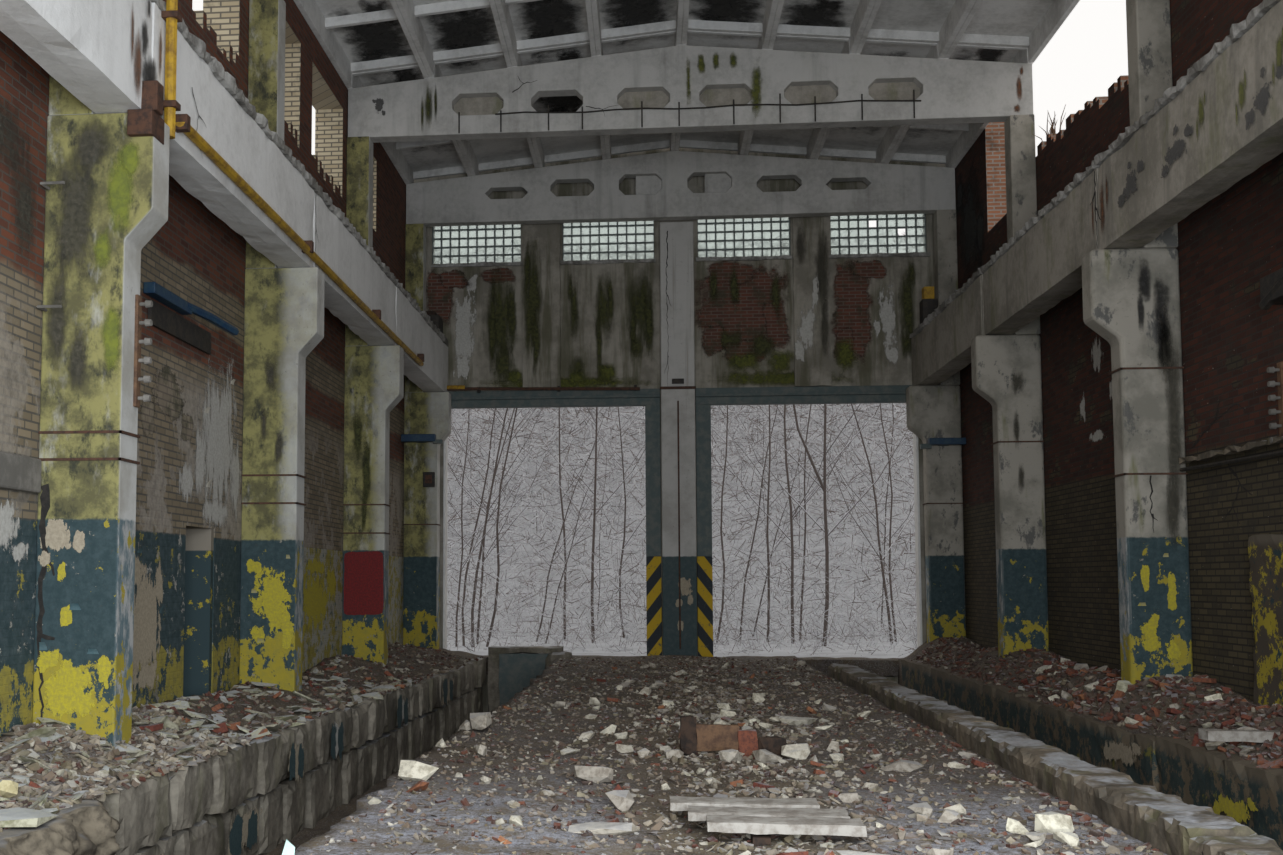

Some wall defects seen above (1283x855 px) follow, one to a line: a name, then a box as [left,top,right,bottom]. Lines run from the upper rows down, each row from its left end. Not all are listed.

leakage [48,123,105,383]
leakage [487,251,541,381]
leakage [573,279,653,381]
spalling [694,259,898,364]
leakage [796,230,828,351]
leakage [901,264,915,355]
peeling [140,363,241,526]
leakage [262,411,282,461]
peeling [0,499,85,582]
peeling [246,555,336,650]
peeling [1138,553,1181,661]
peeling [37,642,111,720]